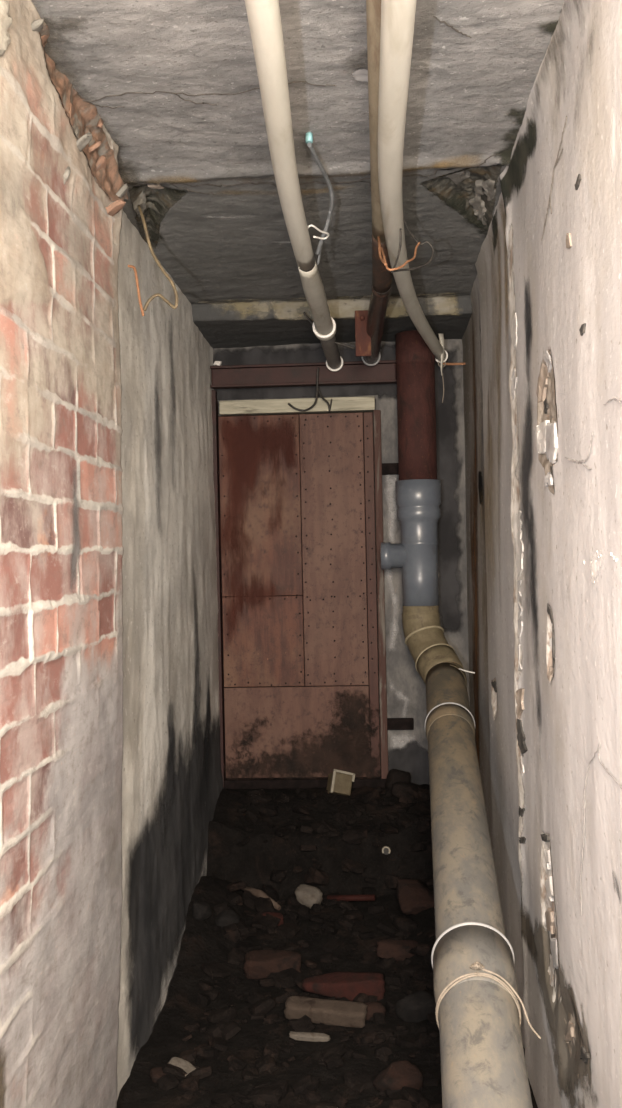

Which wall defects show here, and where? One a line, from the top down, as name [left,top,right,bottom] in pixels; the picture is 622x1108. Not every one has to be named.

spalling [31,18,186,249]
water stain [427,109,536,408]
spalling [535,350,558,494]
water stain [160,708,175,839]
water stain [193,593,211,763]
water stain [336,692,378,758]
spalling [546,603,555,683]
water stain [521,903,597,1108]
spalling [540,832,591,1097]